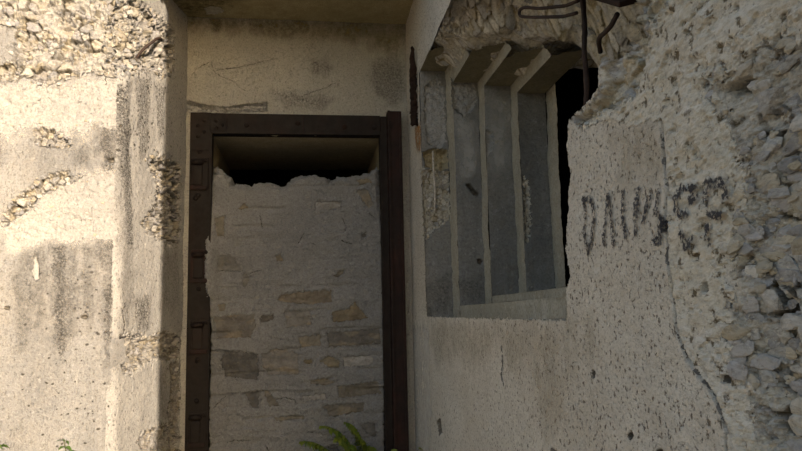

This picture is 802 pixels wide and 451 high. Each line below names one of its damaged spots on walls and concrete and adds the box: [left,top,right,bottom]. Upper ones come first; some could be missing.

spalling [0,0,182,280]
rust [409,46,421,151]
spalling [420,148,451,243]
peeling [430,0,802,451]
water stain [36,246,92,355]
spalling [119,327,181,451]